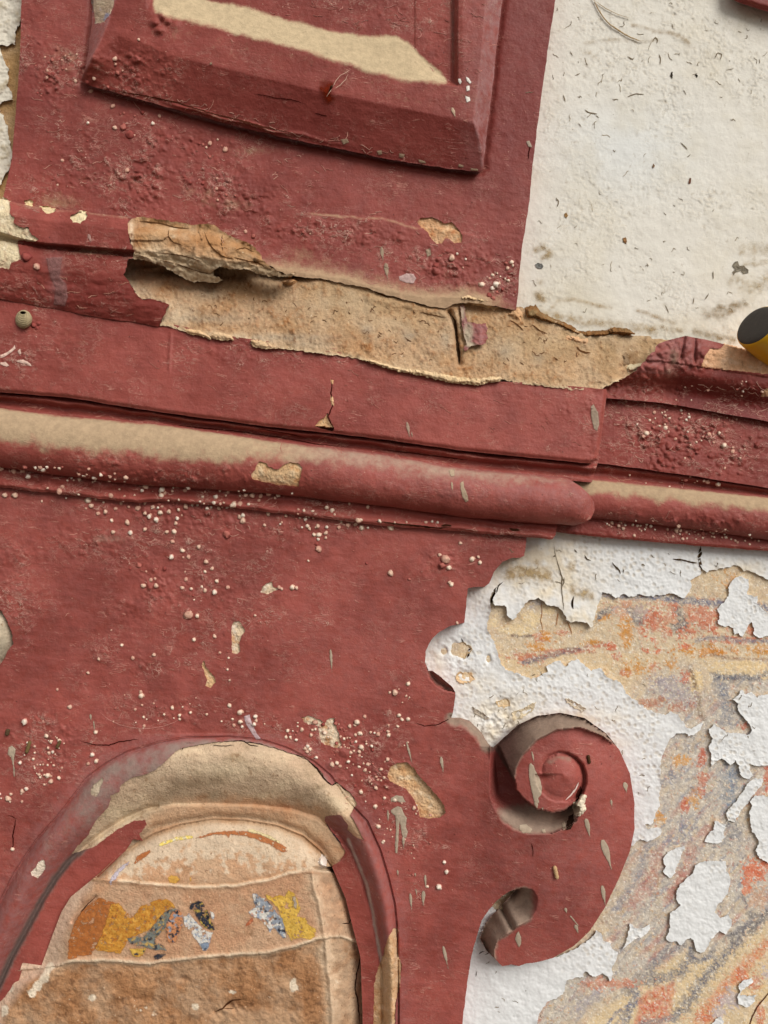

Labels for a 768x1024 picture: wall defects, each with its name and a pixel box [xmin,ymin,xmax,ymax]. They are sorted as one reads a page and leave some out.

spalling [82,196,295,283]
peeling [416,217,462,268]
peeling [251,461,302,487]
crack [540,548,624,633]
peeling [301,715,347,748]
peeling [425,528,768,863]
peeling [72,741,364,865]
peeling [365,760,446,819]
peeling [31,860,46,878]
peeling [663,846,732,953]
peeling [373,928,402,1024]
peeling [463,907,650,1024]